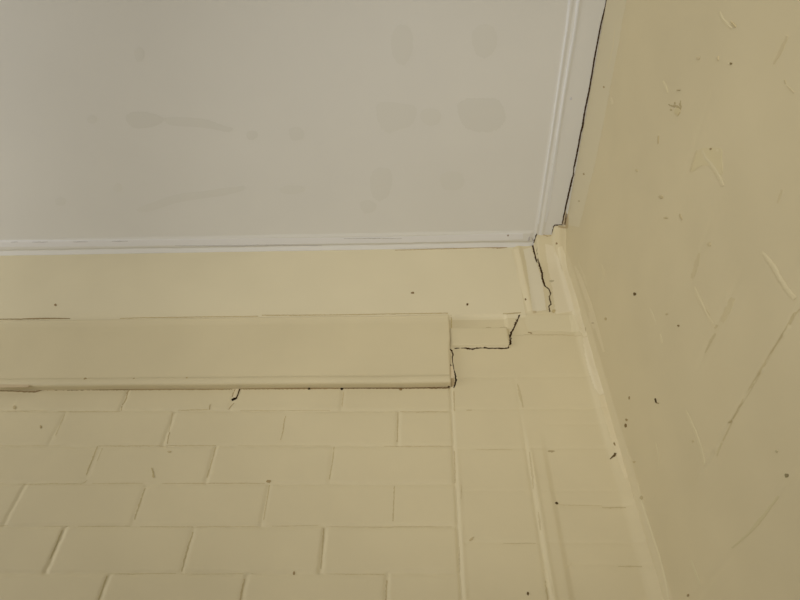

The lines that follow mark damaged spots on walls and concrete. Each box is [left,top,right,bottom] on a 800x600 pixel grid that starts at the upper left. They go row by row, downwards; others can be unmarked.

crack [532,0,607,312]
crack [24,312,581,600]